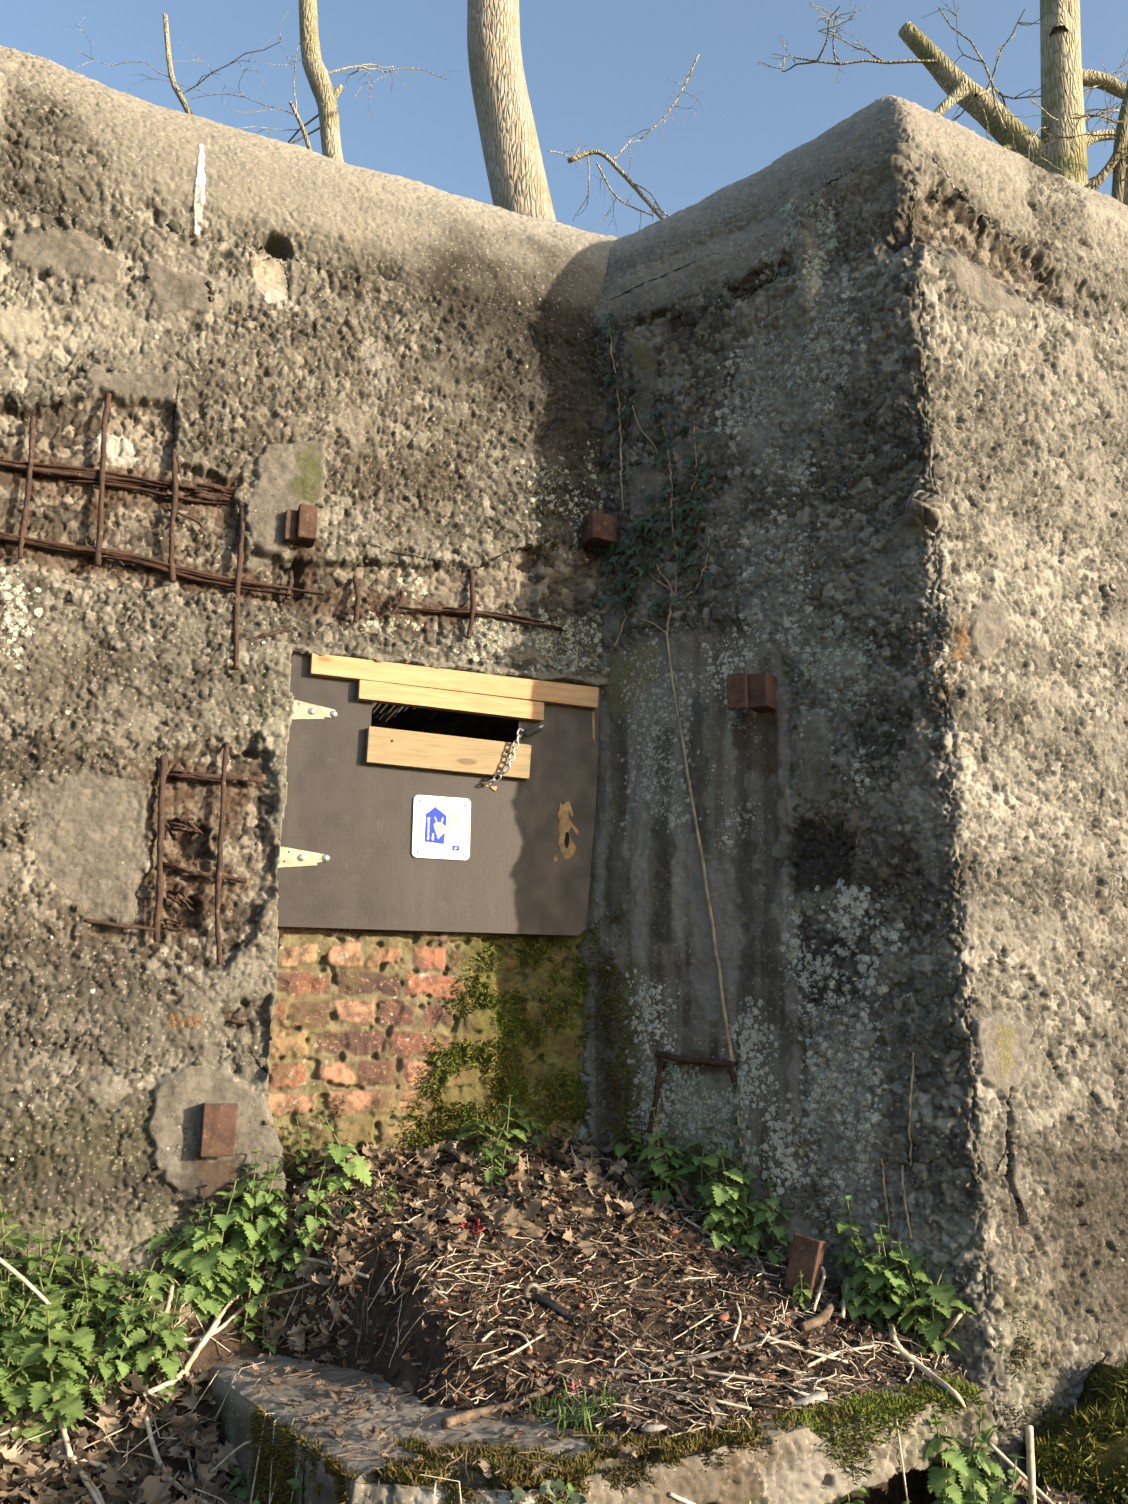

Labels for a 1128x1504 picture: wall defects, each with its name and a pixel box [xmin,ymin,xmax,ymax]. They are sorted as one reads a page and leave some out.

spalling [252,253,292,304]
spalling [0,364,606,670]
spalling [21,741,276,970]